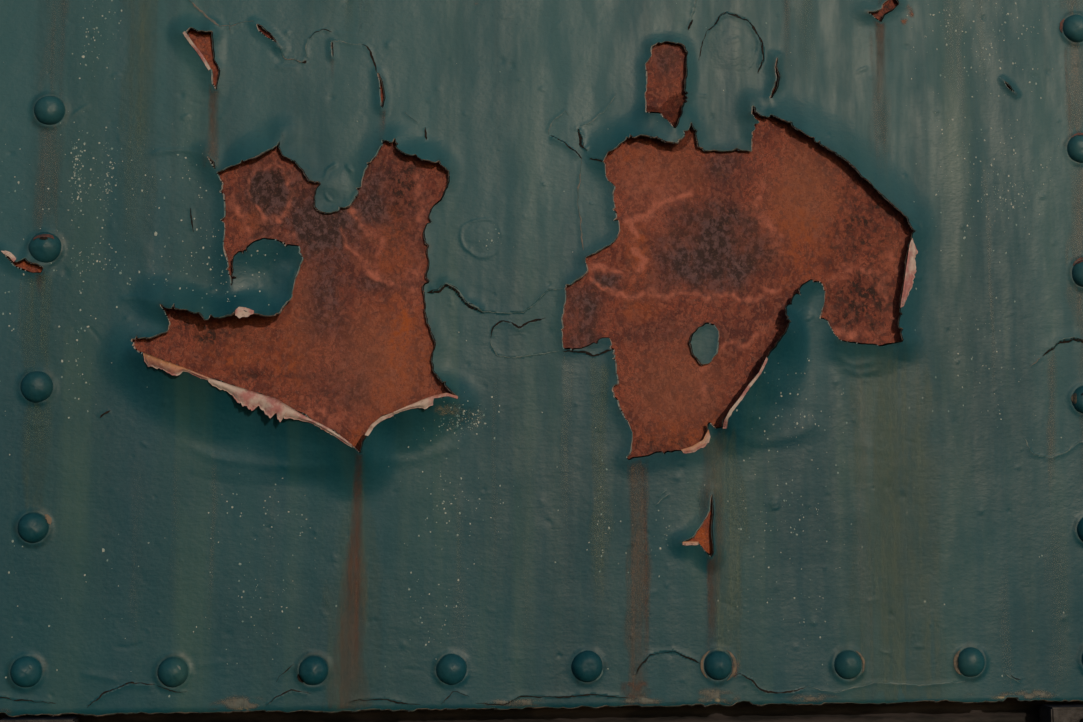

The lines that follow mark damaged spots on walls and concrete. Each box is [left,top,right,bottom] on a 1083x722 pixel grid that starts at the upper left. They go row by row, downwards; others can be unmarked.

peeling [166,11,233,101]
crack [280,29,377,72]
crack [688,0,764,72]
peeling [848,0,910,32]
peeling [97,66,485,505]
peeling [552,29,939,479]
crack [1031,337,1083,366]
peeling [665,483,729,575]